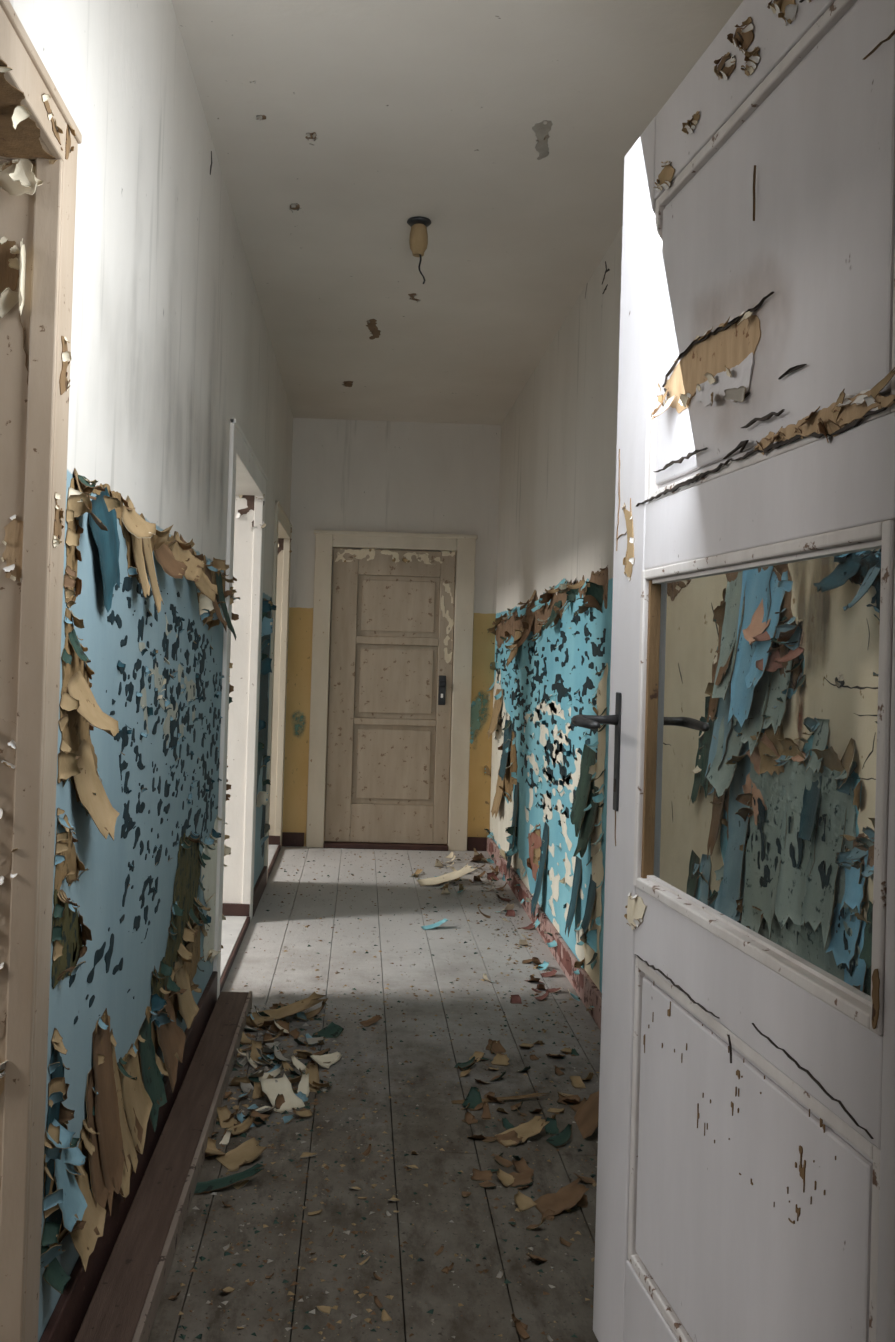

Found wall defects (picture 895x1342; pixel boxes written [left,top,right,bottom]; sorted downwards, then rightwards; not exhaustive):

peeling [714,17,761,80]
peeling [767,0,811,25]
peeling [0,59,76,196]
peeling [0,236,26,318]
peeling [651,311,761,420]
peeling [754,389,882,455]
peeling [409,503,635,1011]
peeling [659,548,881,1029]
peeling [40,469,240,1294]
peeling [728,1046,744,1116]
crack [634,954,874,1139]
peeling [773,1146,826,1224]